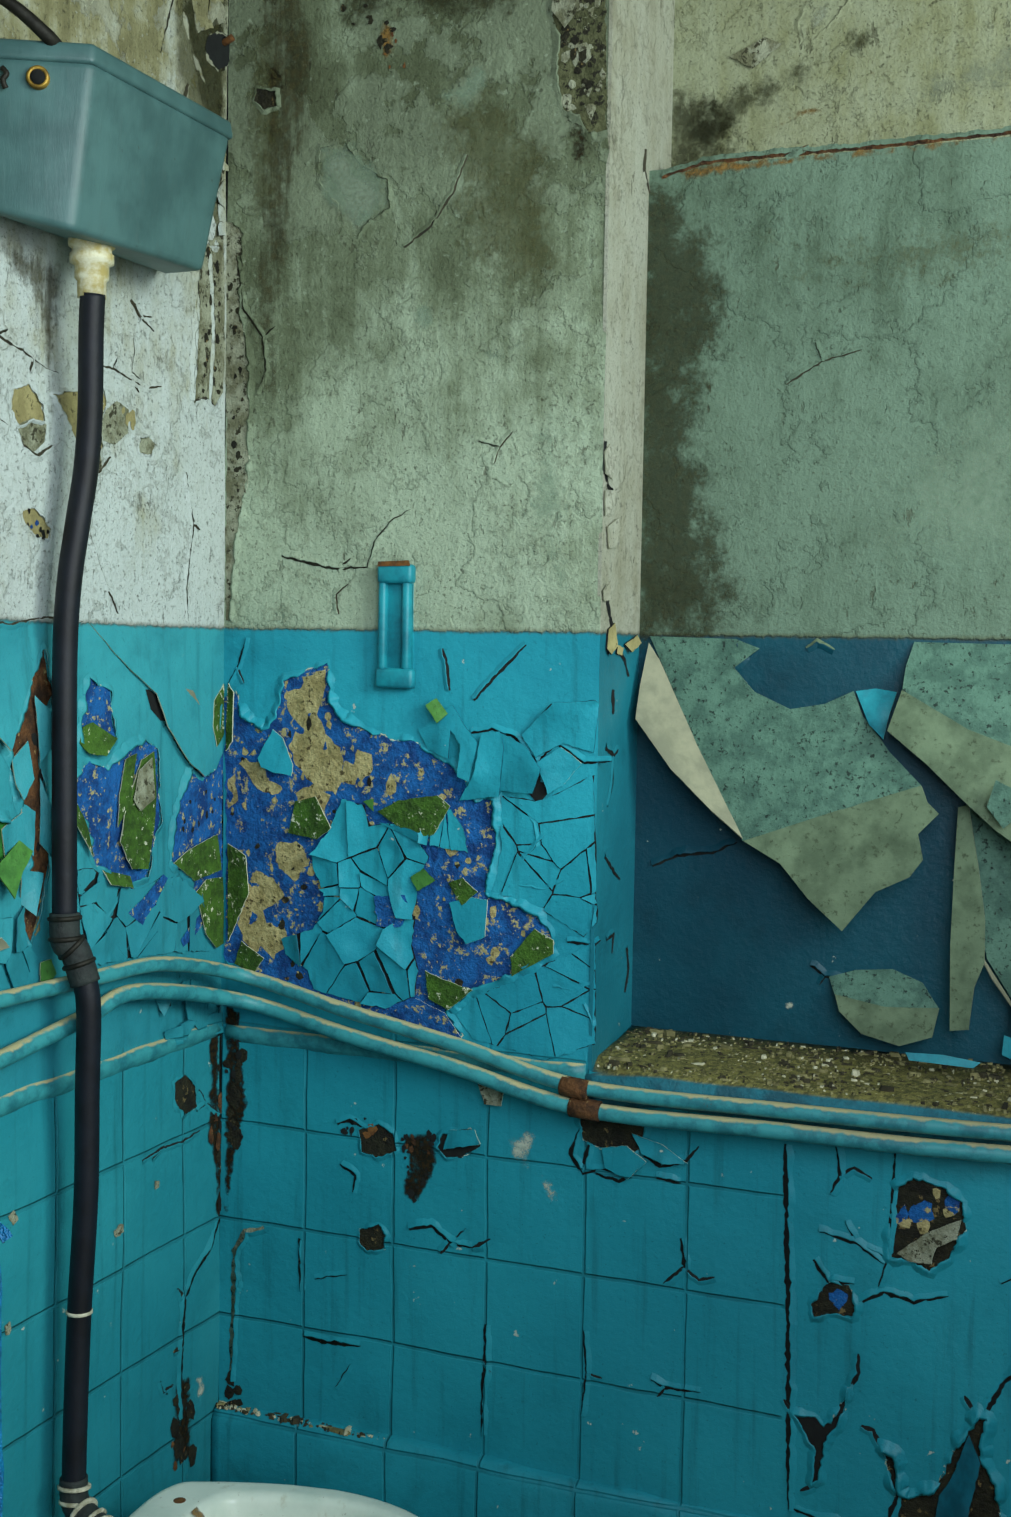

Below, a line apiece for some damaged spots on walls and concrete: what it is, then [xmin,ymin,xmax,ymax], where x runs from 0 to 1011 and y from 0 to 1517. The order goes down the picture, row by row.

flaking render [180,0,235,119]
water stain [260,0,309,300]
flaking render [548,0,609,160]
flaking render [11,380,78,463]
water stain [639,191,737,640]
flaking render [19,506,52,542]
peeling [77,154,612,1061]
peeling [0,636,57,991]
flaking render [335,1114,400,1194]
flaking render [356,1222,391,1255]
peeling [807,1171,972,1324]
peeling [780,1353,1011,1517]